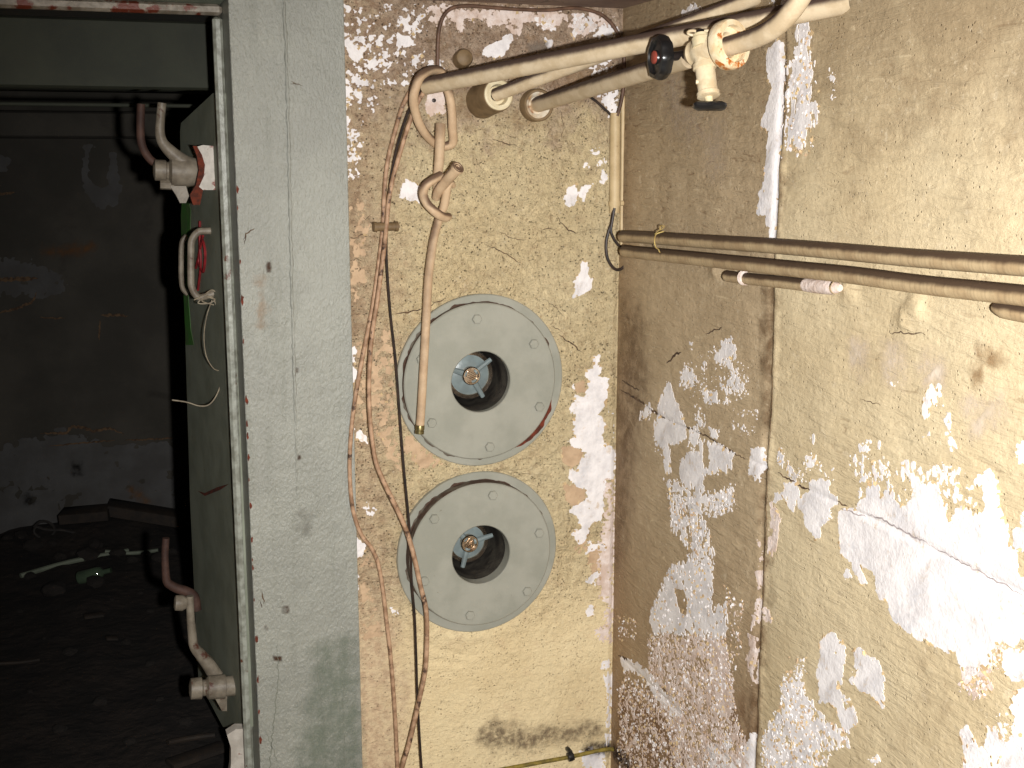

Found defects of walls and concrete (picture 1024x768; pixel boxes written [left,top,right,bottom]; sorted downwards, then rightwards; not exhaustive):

peeling [344,3,620,179]
peeling [756,22,837,238]
crack [621,380,744,458]
crack [759,300,810,664]
peeling [561,335,1024,768]
crack [838,501,1024,596]
water stain [480,725,598,746]
water stain [585,700,680,768]